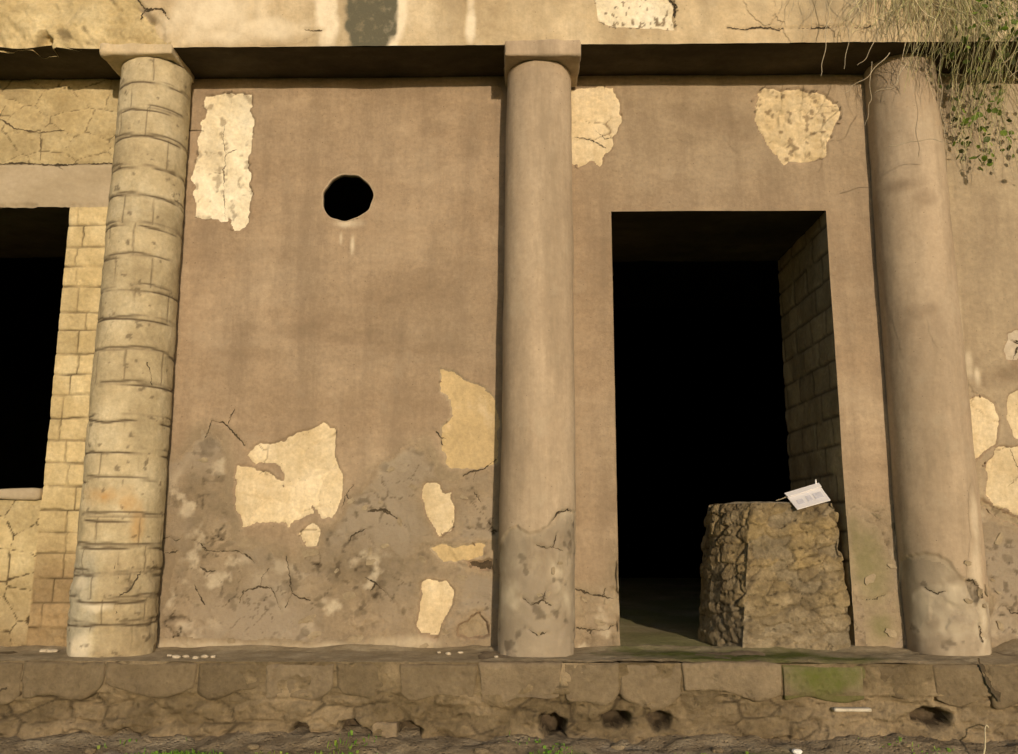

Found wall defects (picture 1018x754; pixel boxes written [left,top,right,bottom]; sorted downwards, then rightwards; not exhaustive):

spalling [0,0,171,59]
peeling [595,0,679,30]
crack [727,23,871,31]
crack [0,109,112,169]
peeling [191,93,254,231]
peeling [571,86,623,169]
peeling [751,88,842,165]
peeling [1004,330,1018,360]
spalling [158,369,617,663]
spalling [847,391,1018,656]